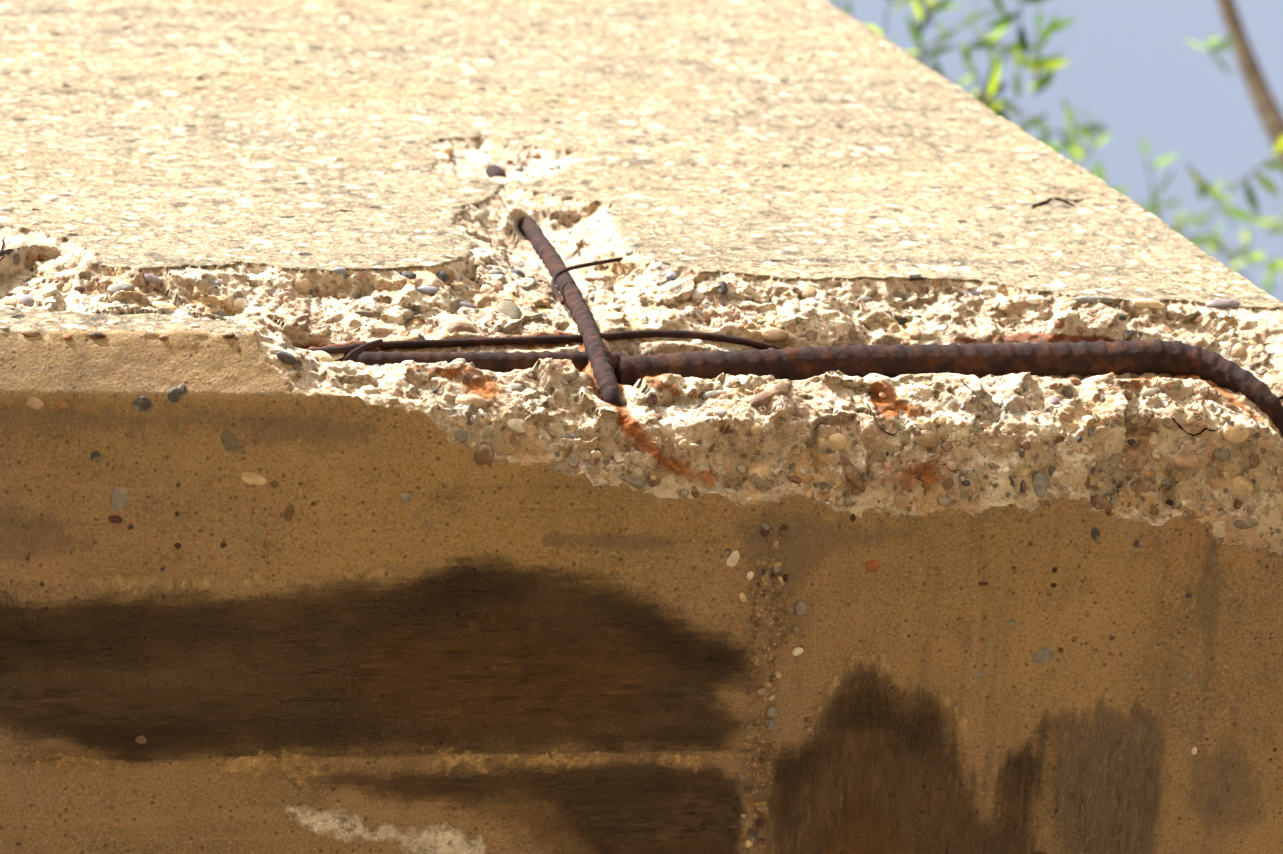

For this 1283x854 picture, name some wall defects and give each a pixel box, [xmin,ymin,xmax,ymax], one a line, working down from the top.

crack [0,237,20,261]
spalling [0,136,1283,556]
rust [953,332,1130,343]
rust [437,366,495,398]
rust [467,331,715,487]
rust [869,380,920,417]
rust [1111,372,1258,420]
leakage [0,564,751,854]
leakage [767,661,1163,854]